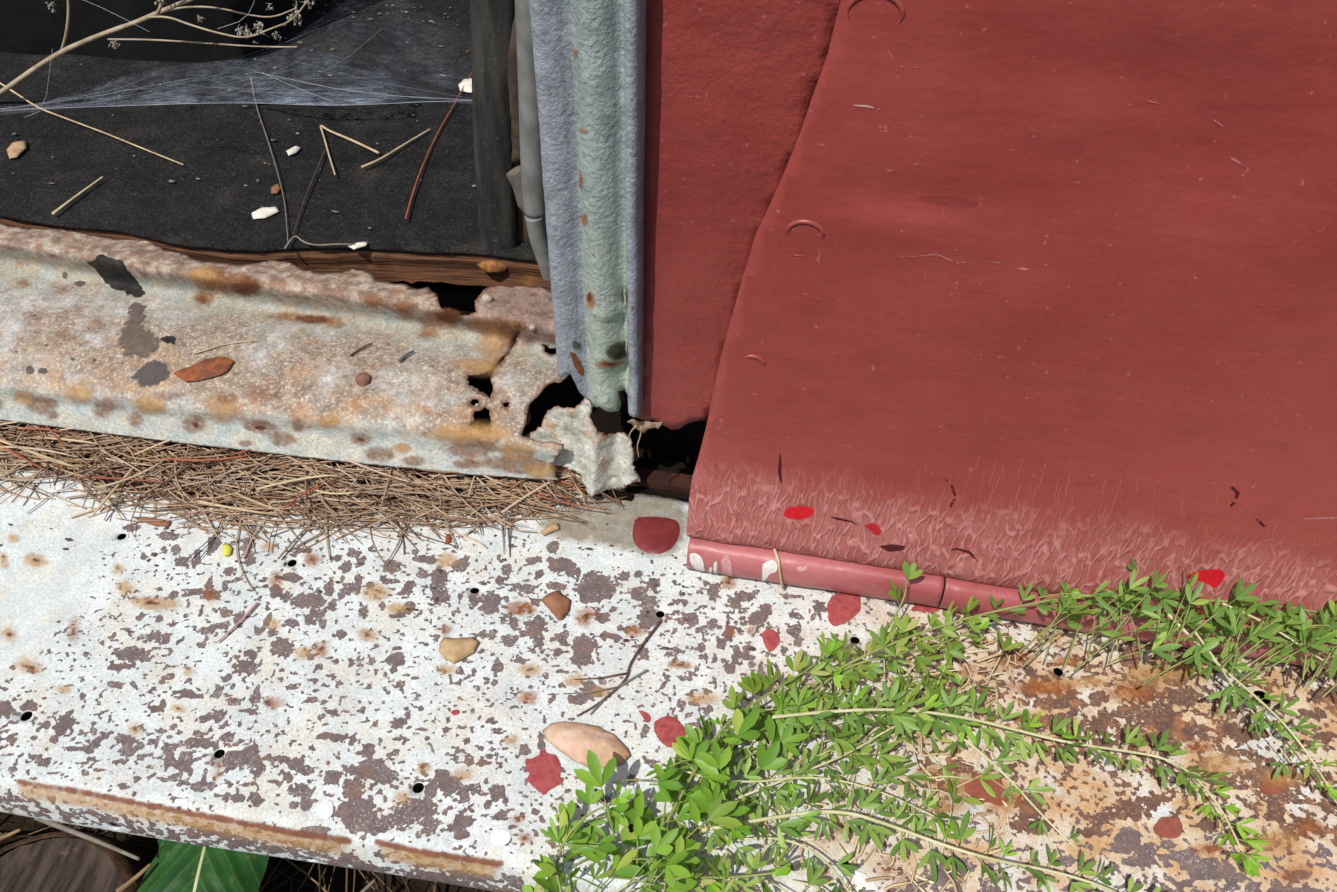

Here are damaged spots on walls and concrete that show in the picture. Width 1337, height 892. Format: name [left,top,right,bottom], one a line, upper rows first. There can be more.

rust [189,267,259,302]
rust [269,313,340,326]
rust [395,303,521,371]
peeling [570,341,584,375]
rust [596,341,628,368]
rust [15,394,56,418]
rust [240,419,301,446]
rust [352,435,419,465]
rust [998,650,1025,667]
peeling [0,507,1337,892]
rust [1012,664,1192,702]
rust [17,780,351,851]